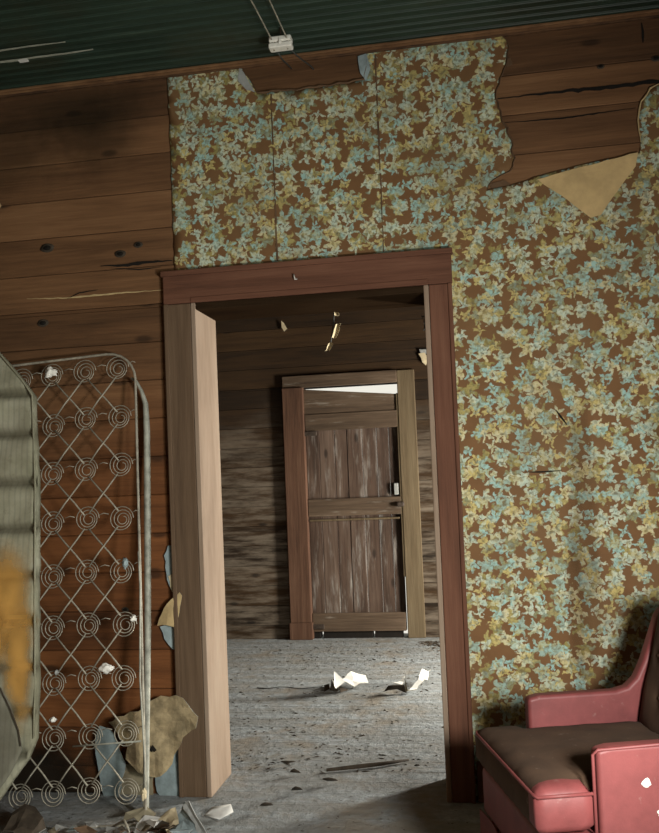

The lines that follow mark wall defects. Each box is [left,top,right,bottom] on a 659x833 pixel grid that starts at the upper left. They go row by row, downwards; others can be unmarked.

crack [498,79,659,99]
crack [505,108,633,123]